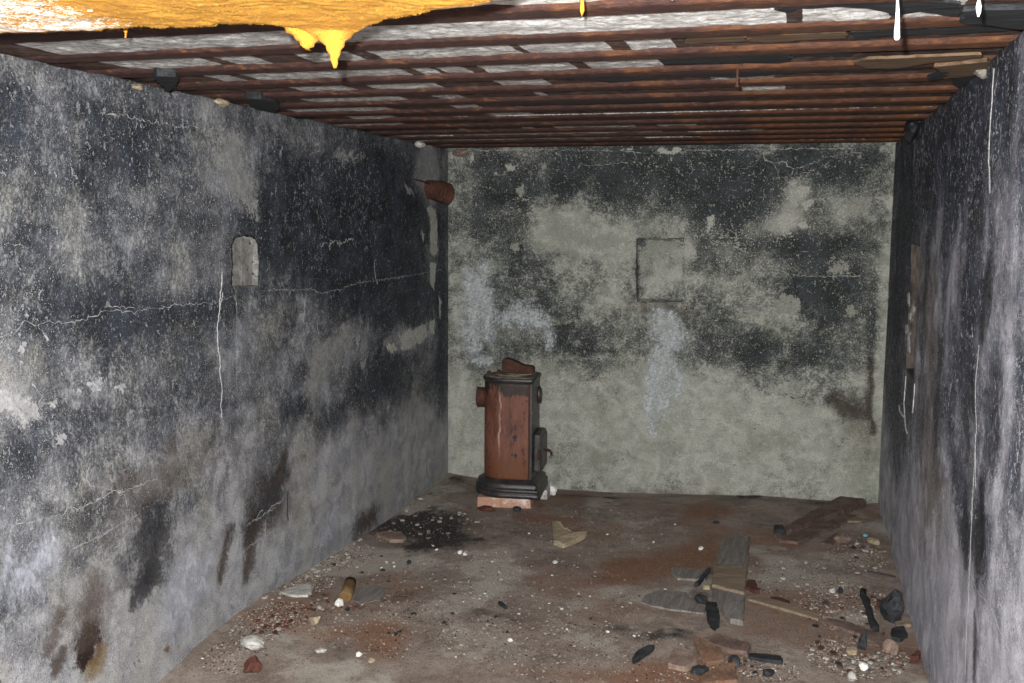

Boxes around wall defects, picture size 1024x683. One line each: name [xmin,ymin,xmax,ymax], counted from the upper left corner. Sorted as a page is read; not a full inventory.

crack [15,234,259,417]
crack [268,262,442,335]
water stain [460,262,554,365]
water stain [979,252,995,343]
water stain [642,309,688,437]
water stain [828,361,876,436]
water stain [898,376,915,434]
crack [12,466,156,549]
water stain [130,450,290,637]
crack [243,497,289,554]
water stain [959,478,985,680]